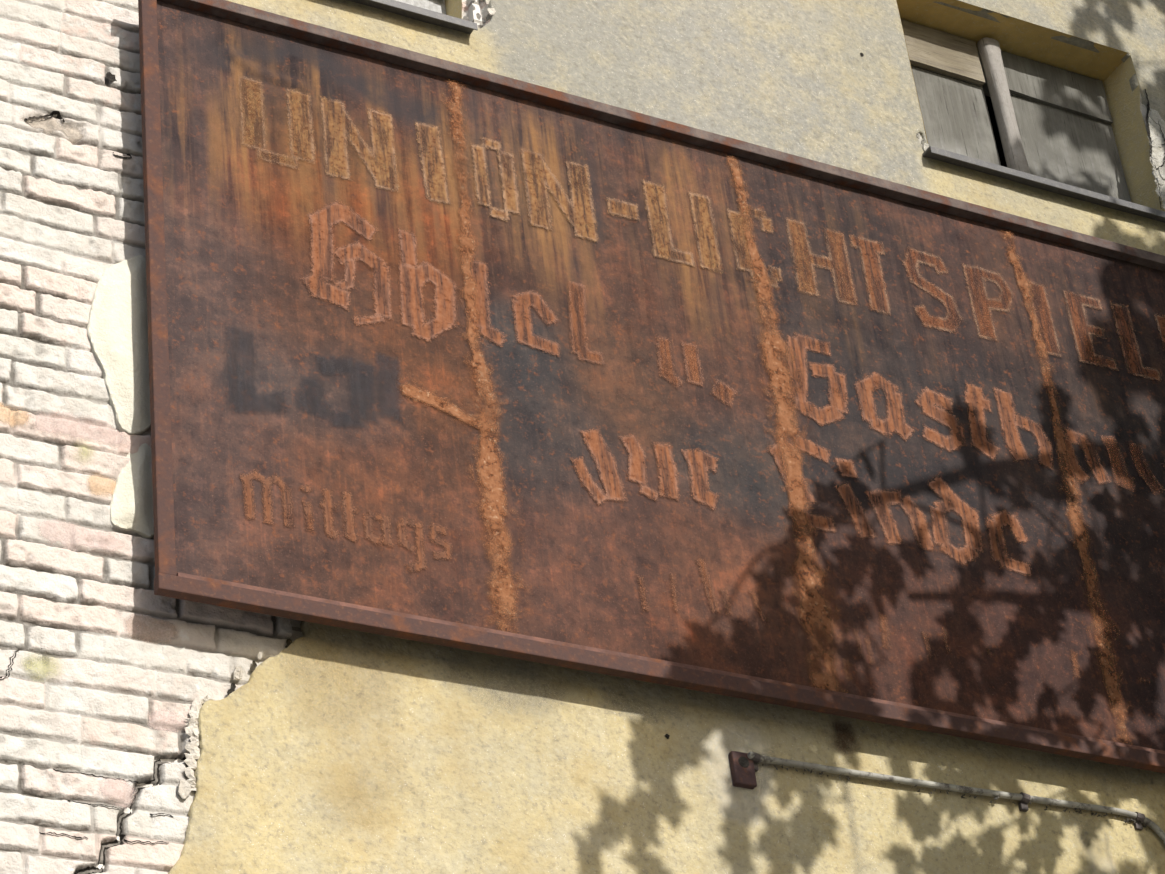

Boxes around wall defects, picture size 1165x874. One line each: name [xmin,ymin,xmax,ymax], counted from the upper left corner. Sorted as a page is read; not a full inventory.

spalling [462,0,496,26]
spalling [22,111,83,145]
peeling [1139,84,1165,209]
peeling [0,403,123,444]
peeling [39,521,123,551]
peeling [126,616,175,641]
crack [227,661,257,695]
spalling [149,695,212,799]
rust [834,722,856,752]
crack [39,741,191,874]
peeling [102,780,133,806]